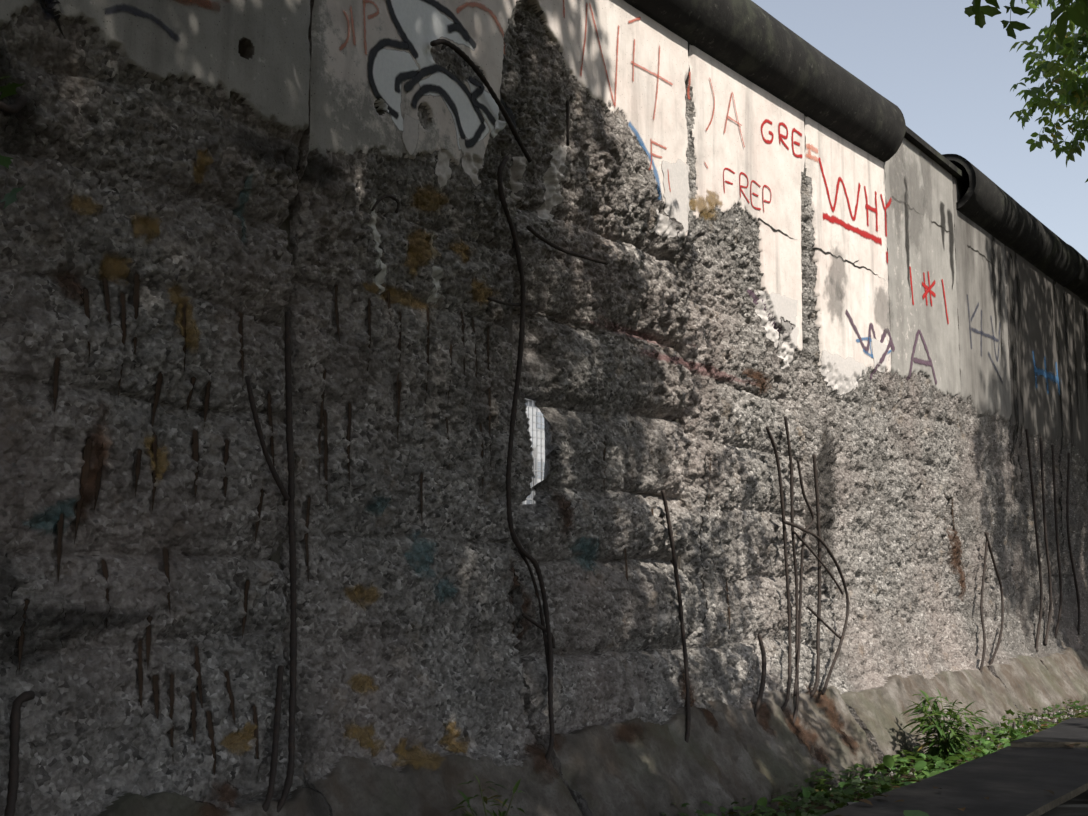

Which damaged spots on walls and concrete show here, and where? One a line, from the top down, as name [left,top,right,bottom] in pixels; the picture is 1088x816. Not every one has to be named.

crack [757,218,880,278]
spalling [0,0,692,816]
spalling [430,0,1088,723]
corrosion [57,426,110,581]
corrosion [784,709,829,764]
corrosion [807,688,858,750]